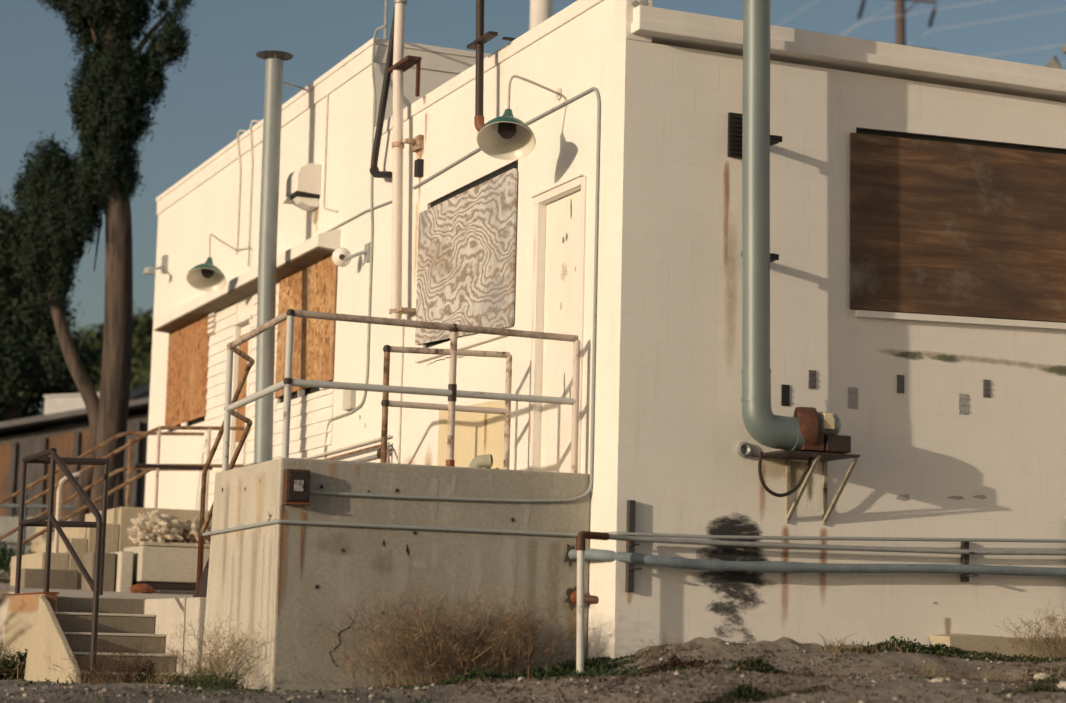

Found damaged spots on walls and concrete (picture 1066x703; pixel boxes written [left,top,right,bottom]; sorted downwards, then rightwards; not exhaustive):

corrosion [790,462,812,499]
crack [329,611,354,667]